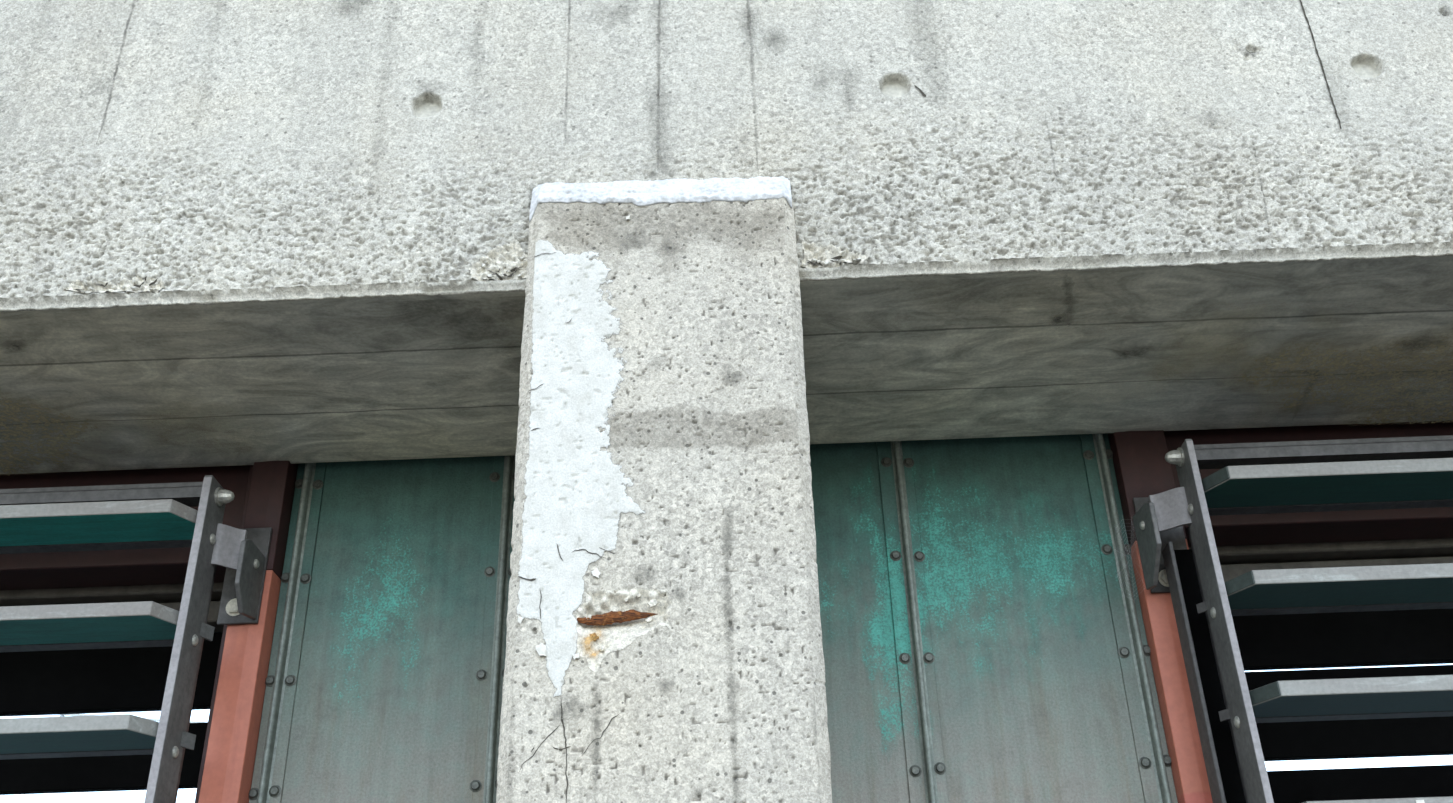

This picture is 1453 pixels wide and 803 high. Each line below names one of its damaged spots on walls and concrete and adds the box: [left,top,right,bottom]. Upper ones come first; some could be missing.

peeling [469,240,672,697]
crack [519,696,619,803]